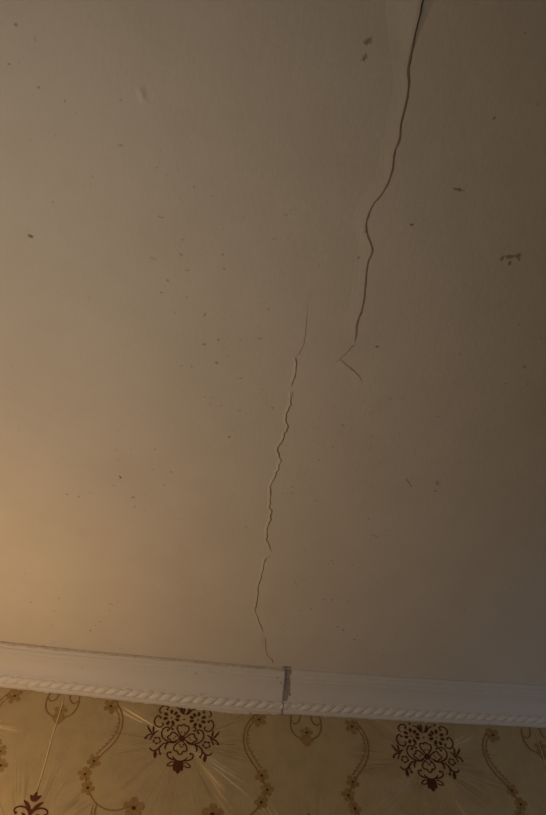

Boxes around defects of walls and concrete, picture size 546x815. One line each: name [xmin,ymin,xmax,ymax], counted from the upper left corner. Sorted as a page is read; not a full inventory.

crack [252,307,308,713]